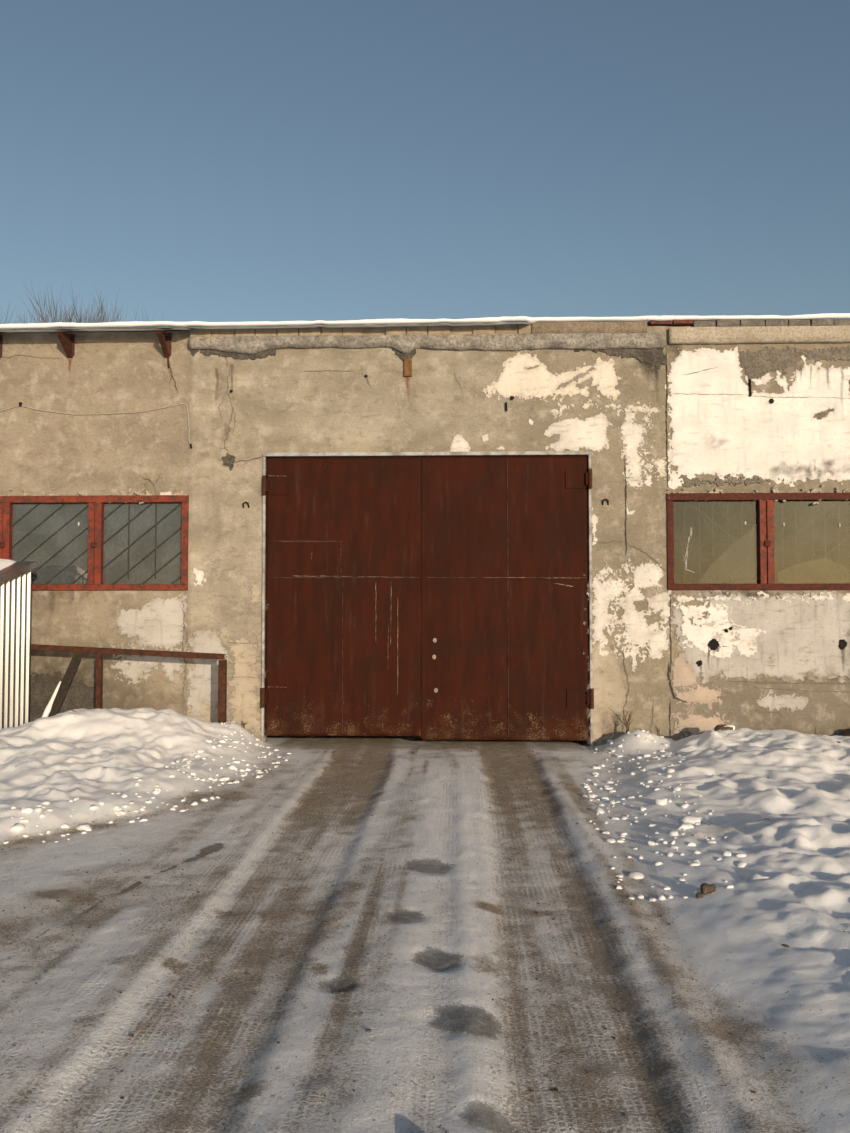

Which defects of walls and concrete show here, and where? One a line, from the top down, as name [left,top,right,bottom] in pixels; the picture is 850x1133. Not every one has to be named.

crack [218,358,262,464]
peeling [483,344,850,505]
peeling [110,563,266,736]
peeling [583,558,850,743]